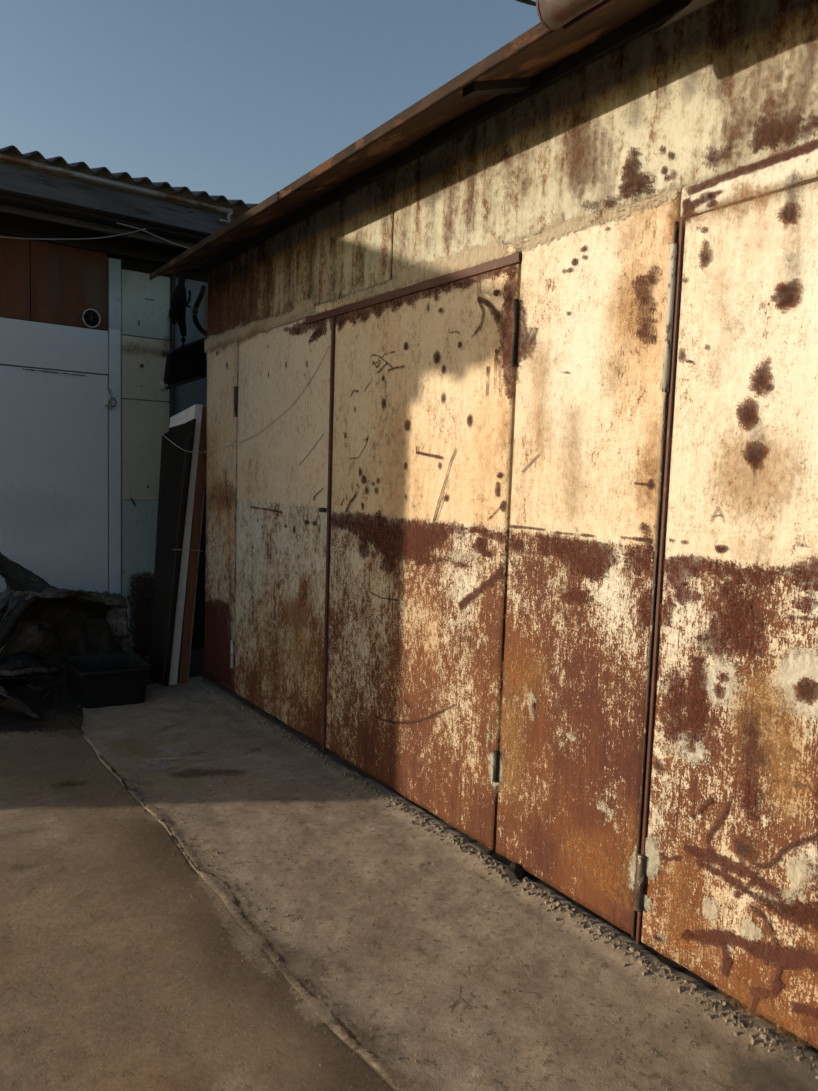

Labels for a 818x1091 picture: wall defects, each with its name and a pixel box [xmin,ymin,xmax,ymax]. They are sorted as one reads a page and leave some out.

rust [686,0,818,211]
rust [777,201,802,227]
rust [698,239,715,274]
rust [770,278,802,313]
rust [713,354,797,510]
peeling [495,472,505,511]
rust [458,562,502,611]
peeling [330,478,818,745]
rust [700,654,745,709]
rust [769,647,818,730]
crack [99,755,380,1059]
rust [668,833,818,978]